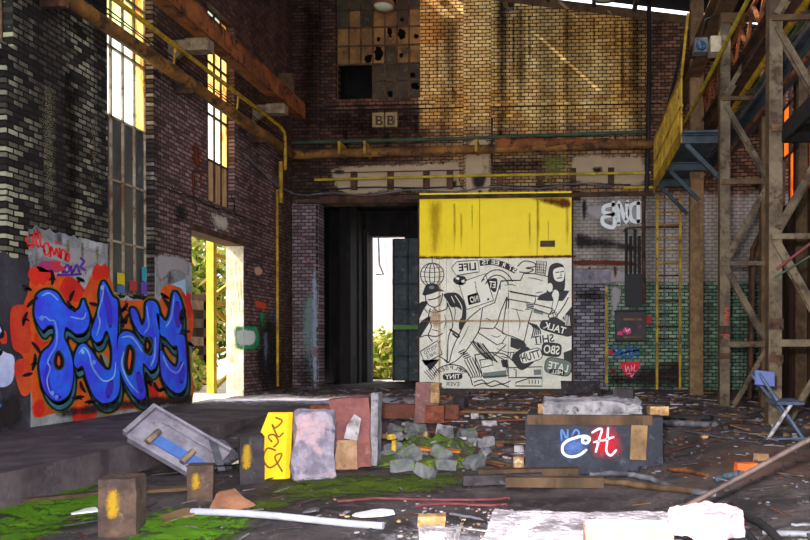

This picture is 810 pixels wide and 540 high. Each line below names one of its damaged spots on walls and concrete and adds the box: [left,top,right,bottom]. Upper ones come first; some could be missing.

leakage [497,1,531,134]
leakage [615,18,642,90]
flaking render [332,139,491,194]
flaking render [571,154,645,186]